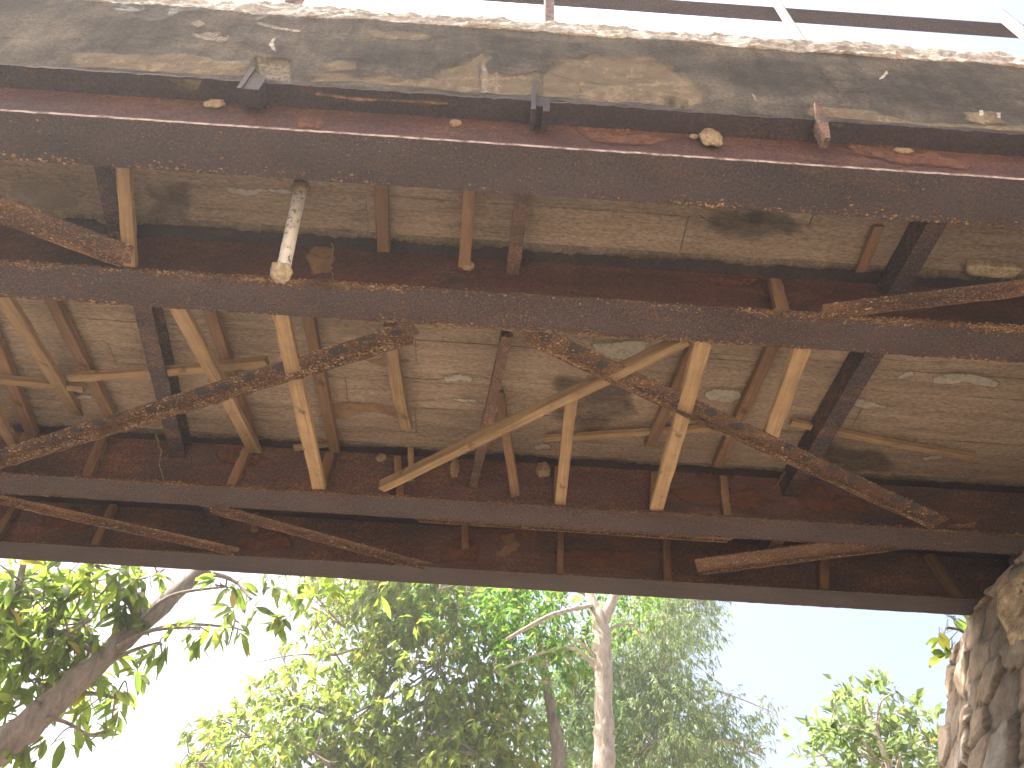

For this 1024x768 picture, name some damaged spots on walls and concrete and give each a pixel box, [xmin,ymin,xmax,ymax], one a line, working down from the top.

spalling [537,57,700,108]
rust [0,115,1024,230]
rust [0,204,525,300]
rust [718,280,1024,336]
rust [0,315,1024,528]
leakage [577,384,630,420]
rust [0,492,334,562]